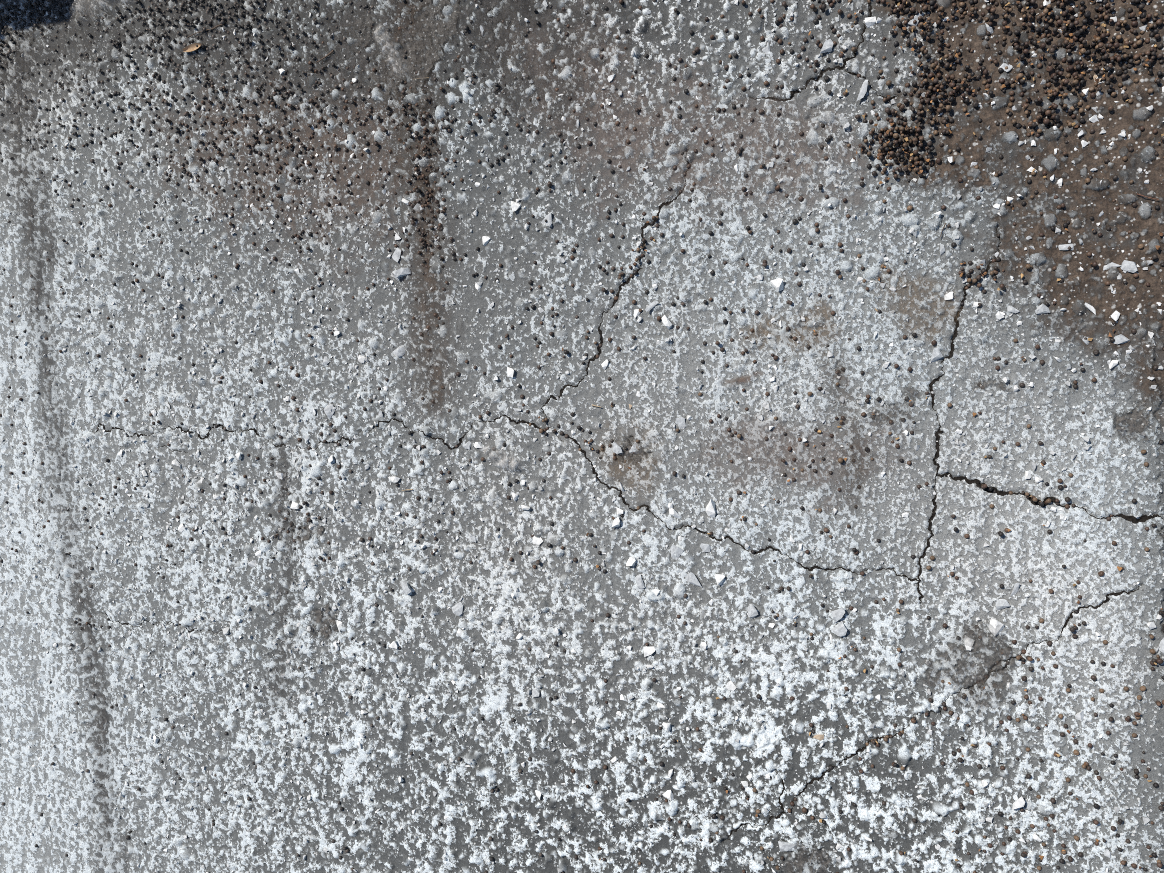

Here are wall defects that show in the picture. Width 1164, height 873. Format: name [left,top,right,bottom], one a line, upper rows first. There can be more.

crack [94,150,1162,604]
crack [723,587,1139,842]